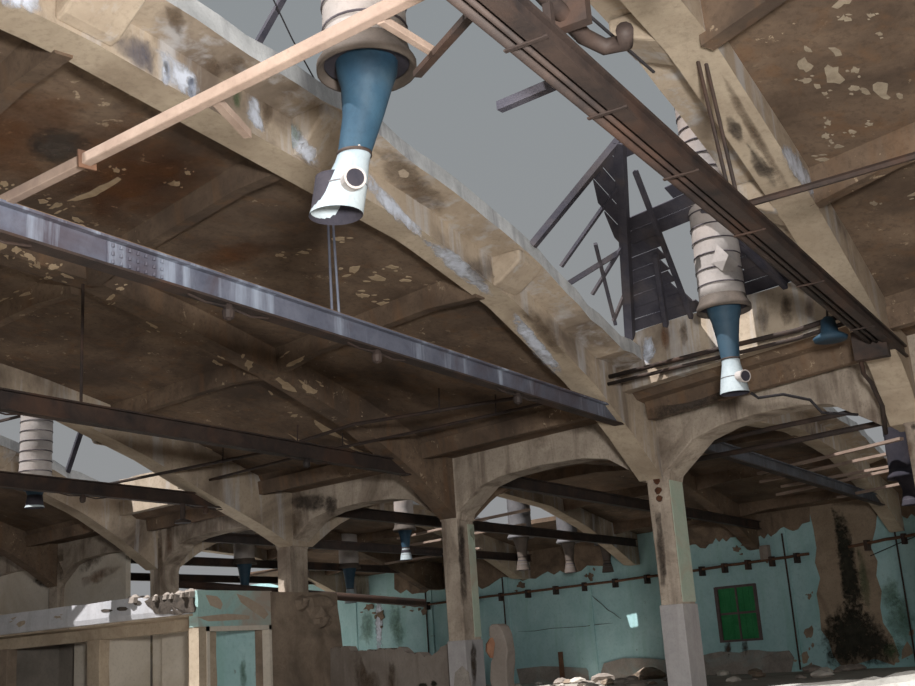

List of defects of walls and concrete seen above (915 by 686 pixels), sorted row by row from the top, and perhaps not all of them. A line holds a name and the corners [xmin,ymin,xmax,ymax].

peeling [832,0,852,21]
peeling [794,45,903,100]
water stain [32,130,85,162]
water stain [729,118,772,176]
water stain [782,148,814,193]
peeling [38,165,126,226]
water stain [292,496,336,534]
peeling [898,493,915,518]
peeling [687,522,743,555]
spalling [703,500,914,675]